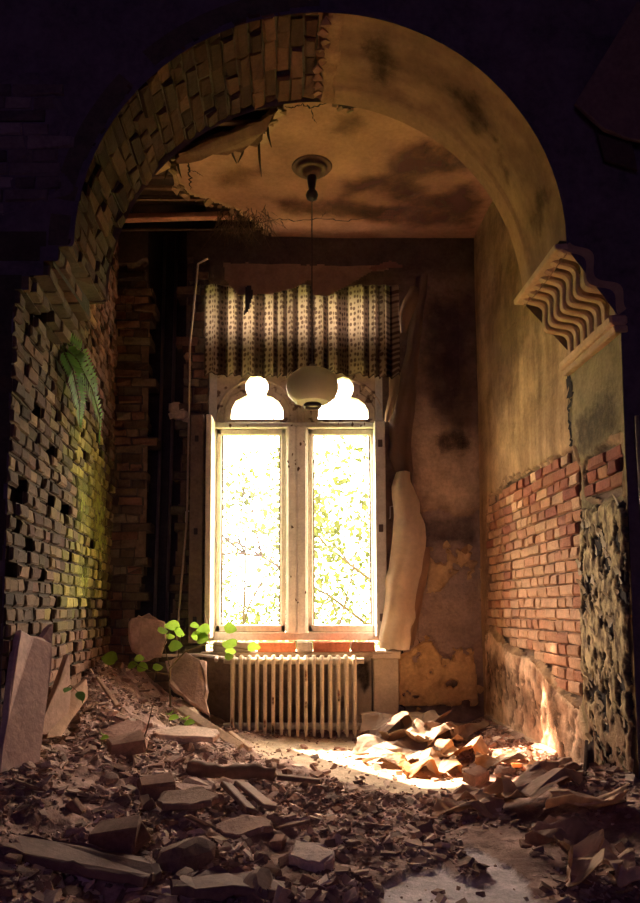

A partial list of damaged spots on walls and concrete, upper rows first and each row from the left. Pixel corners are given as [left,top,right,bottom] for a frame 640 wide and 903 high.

peeling [267,107,287,127]
leakage [280,142,482,227]
flaking render [426,432,636,773]
peeling [398,635,484,711]